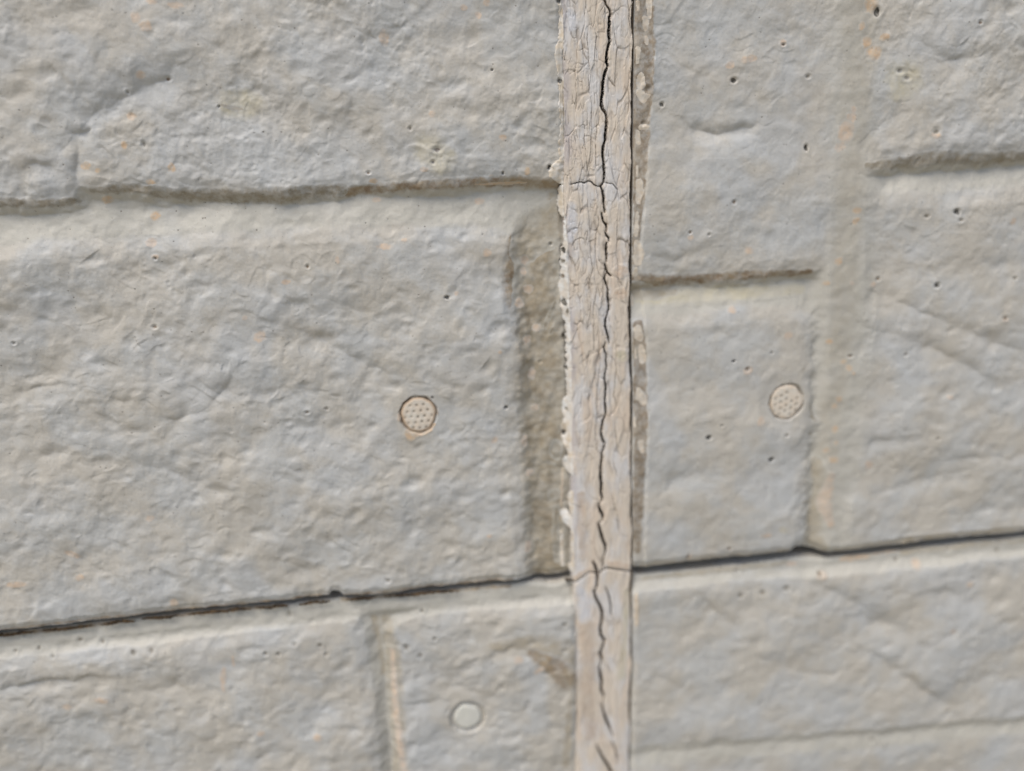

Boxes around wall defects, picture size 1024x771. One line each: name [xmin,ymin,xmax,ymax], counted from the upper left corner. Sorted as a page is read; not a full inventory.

peeling [635,0,652,104]
peeling [635,124,650,145]
peeling [632,165,646,277]
crack [563,0,634,771]
peeling [632,325,647,364]
peeling [636,387,647,405]